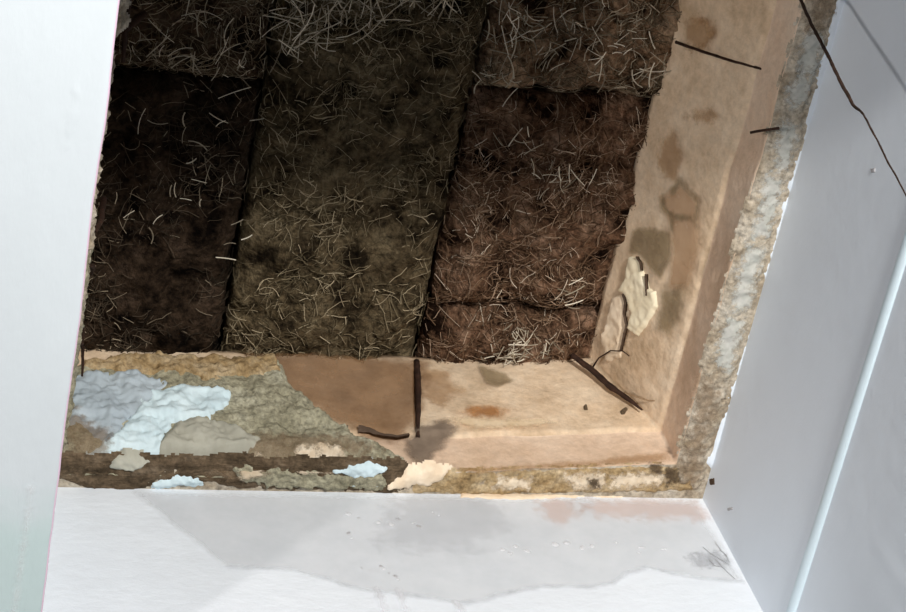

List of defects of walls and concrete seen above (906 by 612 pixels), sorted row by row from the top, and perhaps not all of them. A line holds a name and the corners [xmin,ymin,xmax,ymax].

spalling [59,0,836,500]